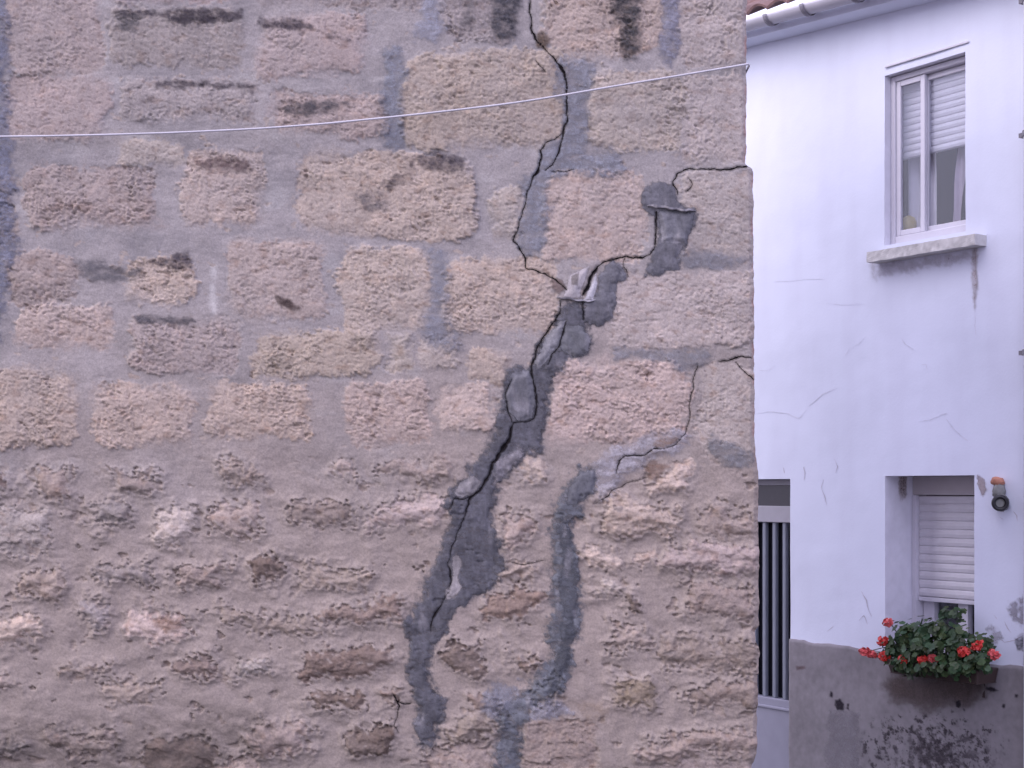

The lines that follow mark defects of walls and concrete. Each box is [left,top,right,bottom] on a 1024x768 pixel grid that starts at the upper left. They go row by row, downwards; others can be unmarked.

crack [672,166,748,194]
crack [430,1,657,631]
crack [595,356,753,504]
damp [863,675,991,768]